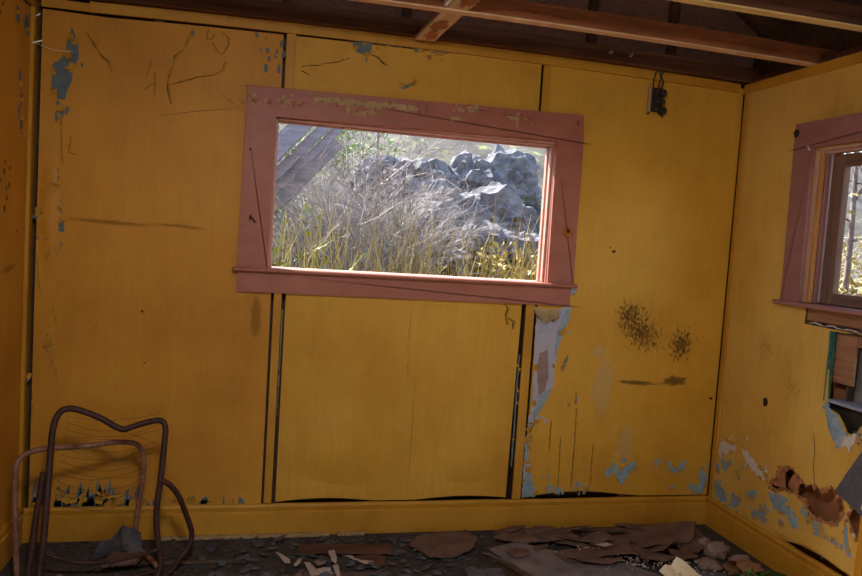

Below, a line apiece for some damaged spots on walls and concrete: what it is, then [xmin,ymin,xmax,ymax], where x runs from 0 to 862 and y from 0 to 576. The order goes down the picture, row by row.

peeling [47,28,83,123]
leakage [618,300,658,352]
peeling [510,288,589,498]
peeling [604,457,638,485]
peeling [653,458,688,473]
spalling [688,435,861,561]